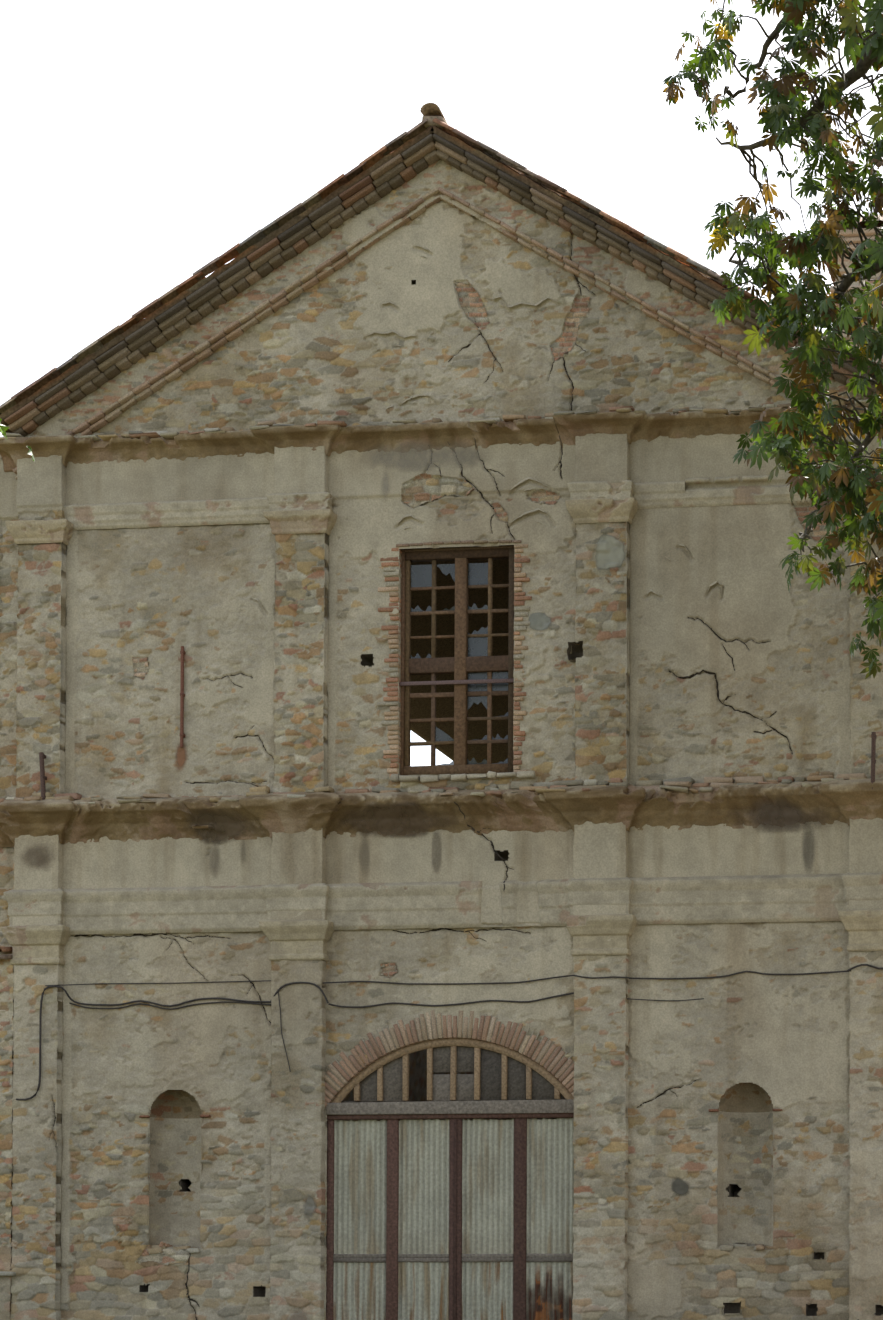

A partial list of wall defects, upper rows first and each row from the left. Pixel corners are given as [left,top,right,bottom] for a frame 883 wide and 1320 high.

spalling [455,279,489,331]
crack [448,297,503,382]
spalling [550,294,590,361]
crack [427,441,515,540]
spalling [792,500,847,548]
crack [669,617,793,754]
rust [176,745,186,768]
crack [454,802,514,890]
spalling [179,1179,192,1192]
crack [185,1257,199,1320]
spalling [253,1285,266,1297]
rust [526,1272,573,1320]